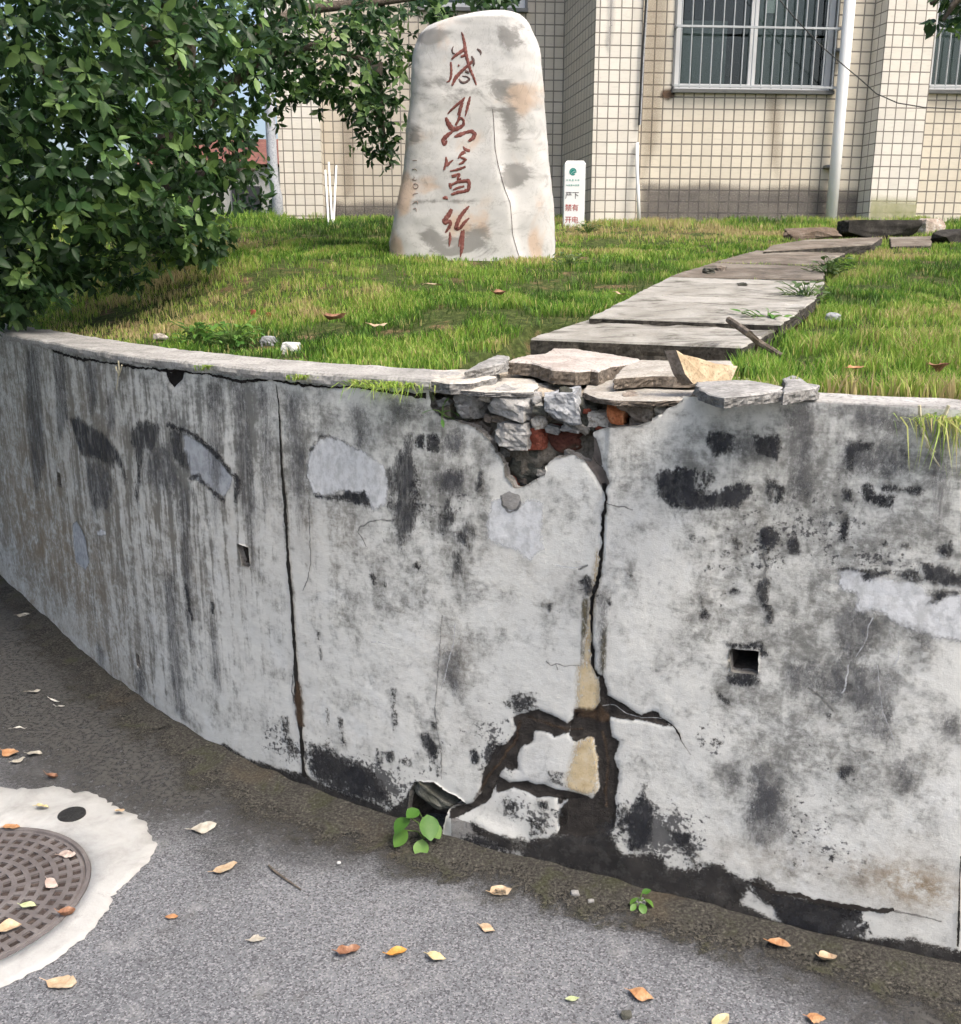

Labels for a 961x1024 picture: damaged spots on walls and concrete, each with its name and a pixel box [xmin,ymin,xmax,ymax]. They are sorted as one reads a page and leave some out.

damp [53,354,193,719]
peeling [166,423,241,503]
crack [53,350,426,777]
peeling [307,435,388,509]
flaking render [585,436,609,487]
damp [656,465,753,511]
damp [707,406,813,503]
damp [754,526,800,624]
damp [842,440,923,508]
crack [449,483,691,837]
flaking render [412,790,517,854]
damp [496,784,961,964]